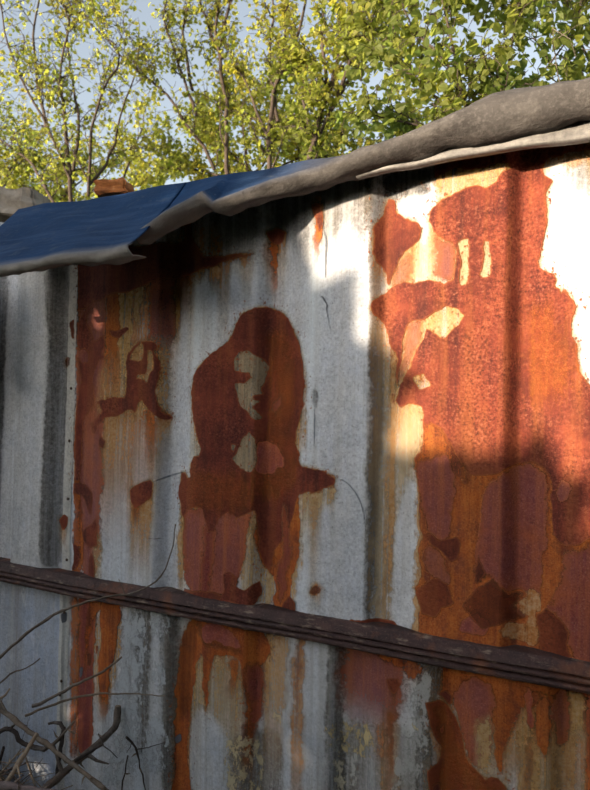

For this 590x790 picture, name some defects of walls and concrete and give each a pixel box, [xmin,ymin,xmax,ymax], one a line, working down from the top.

rust [311,195,324,247]
water stain [39,273,69,566]
rust [59,223,344,611]
rust [364,142,590,662]
rust [61,597,122,756]
rust [161,620,306,790]
peeling [223,730,282,790]
rust [348,618,398,626]
rust [335,648,423,790]
rust [414,668,590,790]